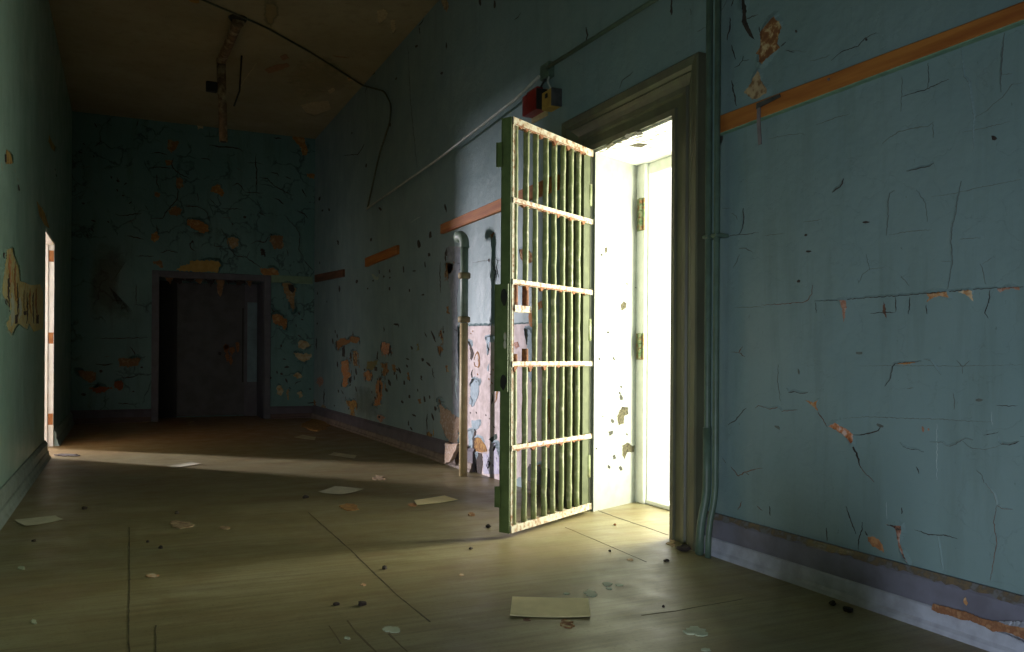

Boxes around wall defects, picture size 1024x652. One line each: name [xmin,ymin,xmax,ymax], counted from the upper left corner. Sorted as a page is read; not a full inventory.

spalling [744,11,792,102]
peeling [1,246,43,336]
peeling [177,257,246,297]
crack [730,163,1023,317]
peeling [332,246,501,480]
peeling [514,301,559,479]
peeling [602,386,635,471]
spalling [827,419,883,468]
crack [728,360,1023,578]
spalling [931,604,1024,644]